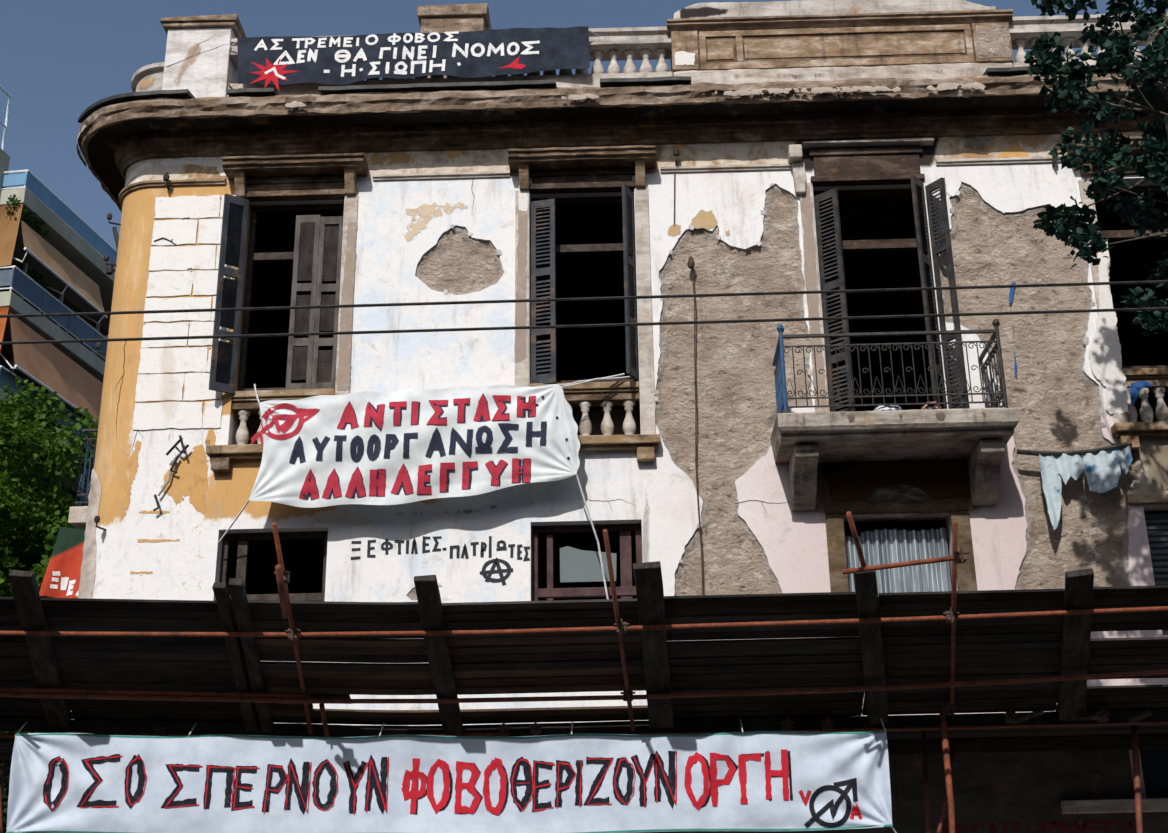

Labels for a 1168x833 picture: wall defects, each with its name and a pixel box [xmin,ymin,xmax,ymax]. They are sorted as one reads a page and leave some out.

peeling [120,428,216,519]
spalling [402,202,528,363]
spalling [651,183,827,596]
spalling [938,183,1143,590]